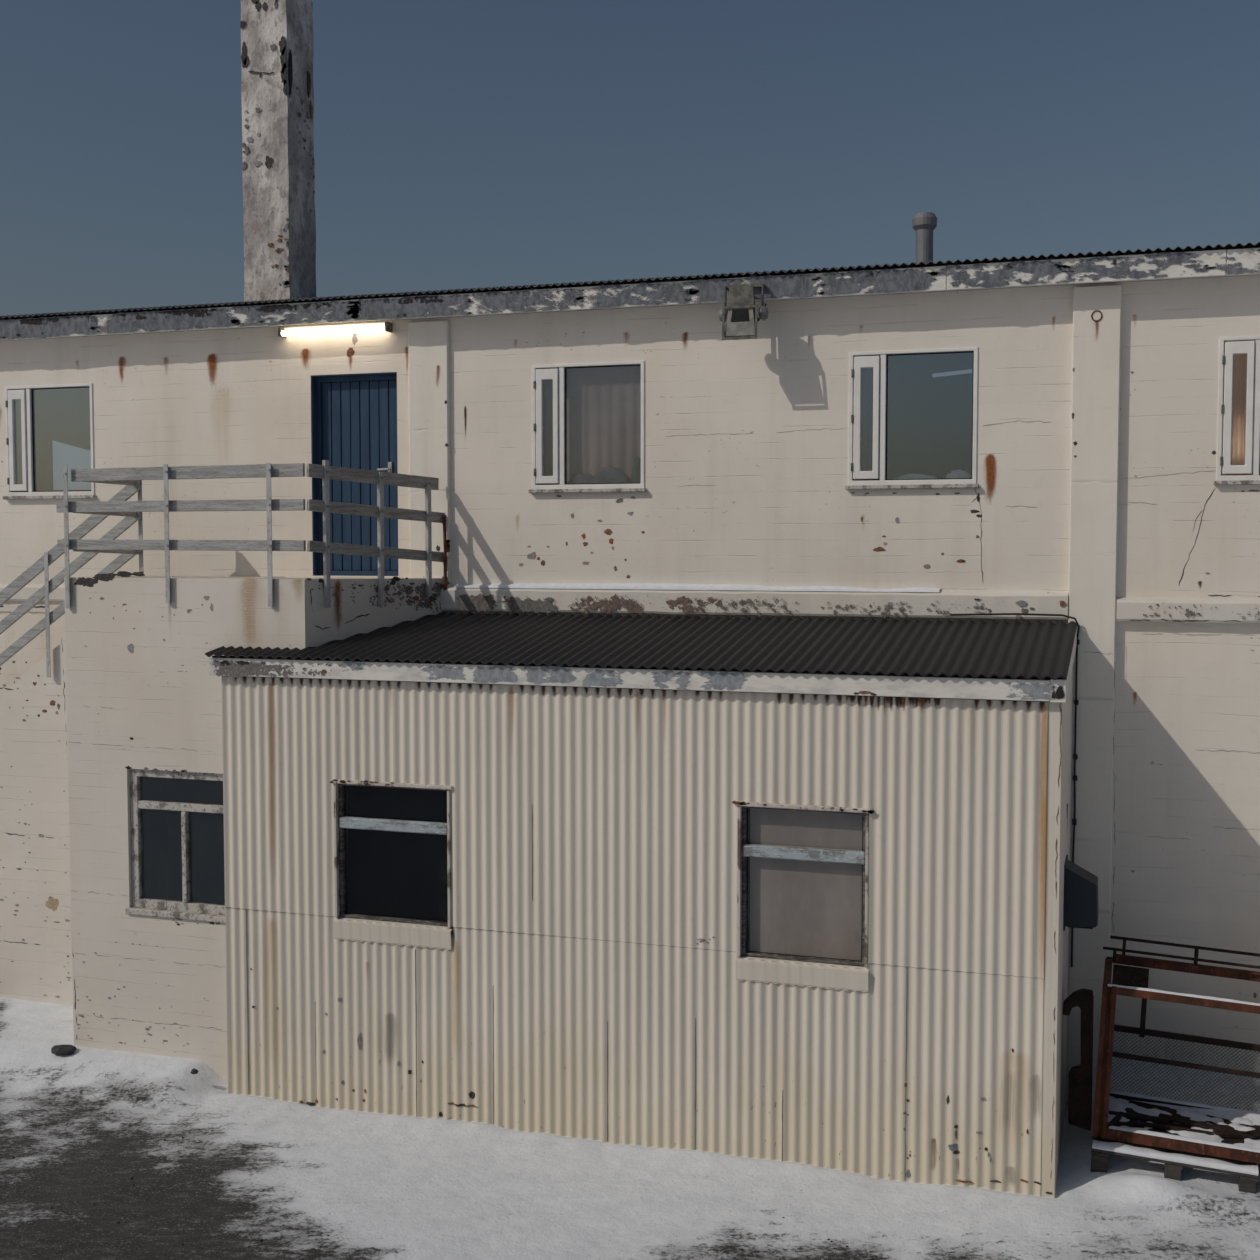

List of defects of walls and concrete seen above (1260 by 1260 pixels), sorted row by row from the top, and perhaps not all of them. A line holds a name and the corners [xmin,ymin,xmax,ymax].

spalling [242,108,273,170]
spalling [267,218,289,287]
corrosion [208,354,216,381]
corrosion [986,454,995,496]
crack [1125,471,1215,584]
peeling [306,576,450,624]
peeling [821,598,991,619]
peeling [210,660,366,678]
peeling [422,665,622,687]
peeling [652,670,747,691]
peeling [1007,683,1065,700]
crack [1092,595,1260,931]